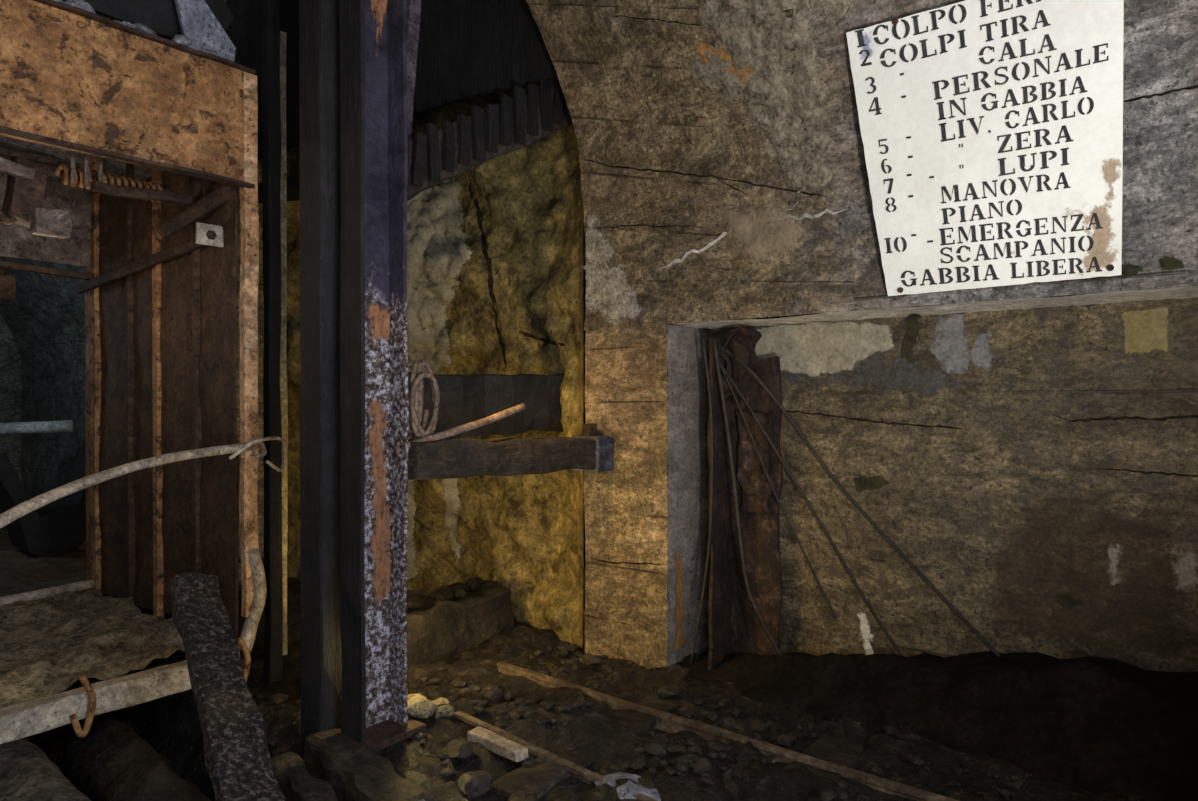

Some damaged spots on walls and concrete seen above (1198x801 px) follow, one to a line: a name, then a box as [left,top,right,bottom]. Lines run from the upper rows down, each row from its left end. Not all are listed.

rust [371,0,387,44]
spalling [688,0,853,193]
crack [469,179,569,368]
peeling [748,320,894,377]
peeling [930,313,992,374]
crack [1053,414,1198,422]
rust [368,400,391,605]